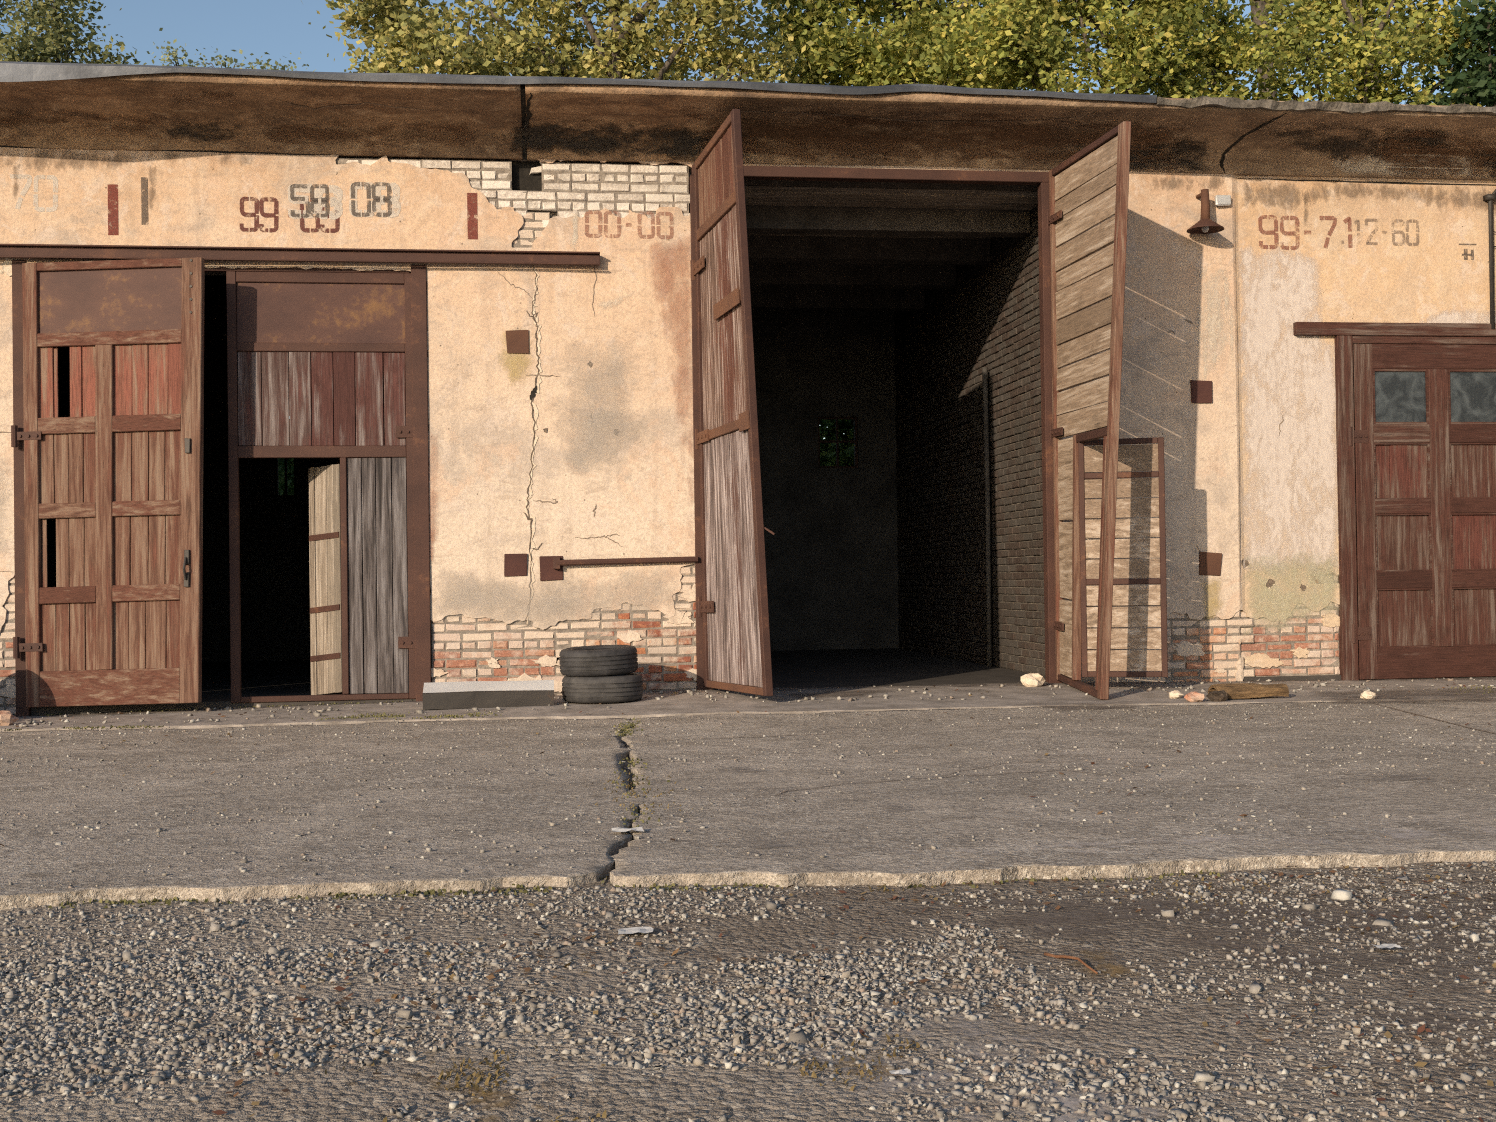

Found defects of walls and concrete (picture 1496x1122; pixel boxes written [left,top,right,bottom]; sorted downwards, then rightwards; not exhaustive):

flaking render [336,158,690,251]
water stain [1277,126,1496,177]
crack [500,265,622,624]
peeling [1164,249,1340,682]
flaking render [431,564,697,695]